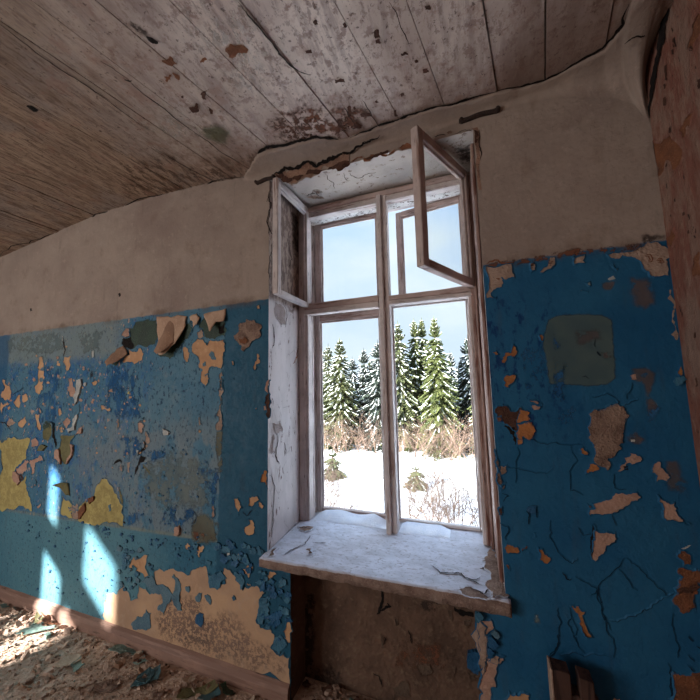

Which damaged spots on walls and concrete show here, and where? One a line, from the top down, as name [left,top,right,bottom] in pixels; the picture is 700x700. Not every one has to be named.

crack [258,5,669,197]
spalling [275,142,411,186]
peeling [0,346,117,488]
peeling [182,328,235,432]
crack [507,435,584,495]
spalling [579,403,644,475]
peeling [458,448,552,601]
peeling [586,491,642,562]
peeling [103,542,293,687]
crack [432,565,489,594]
peeling [454,607,531,700]
crack [549,520,700,697]